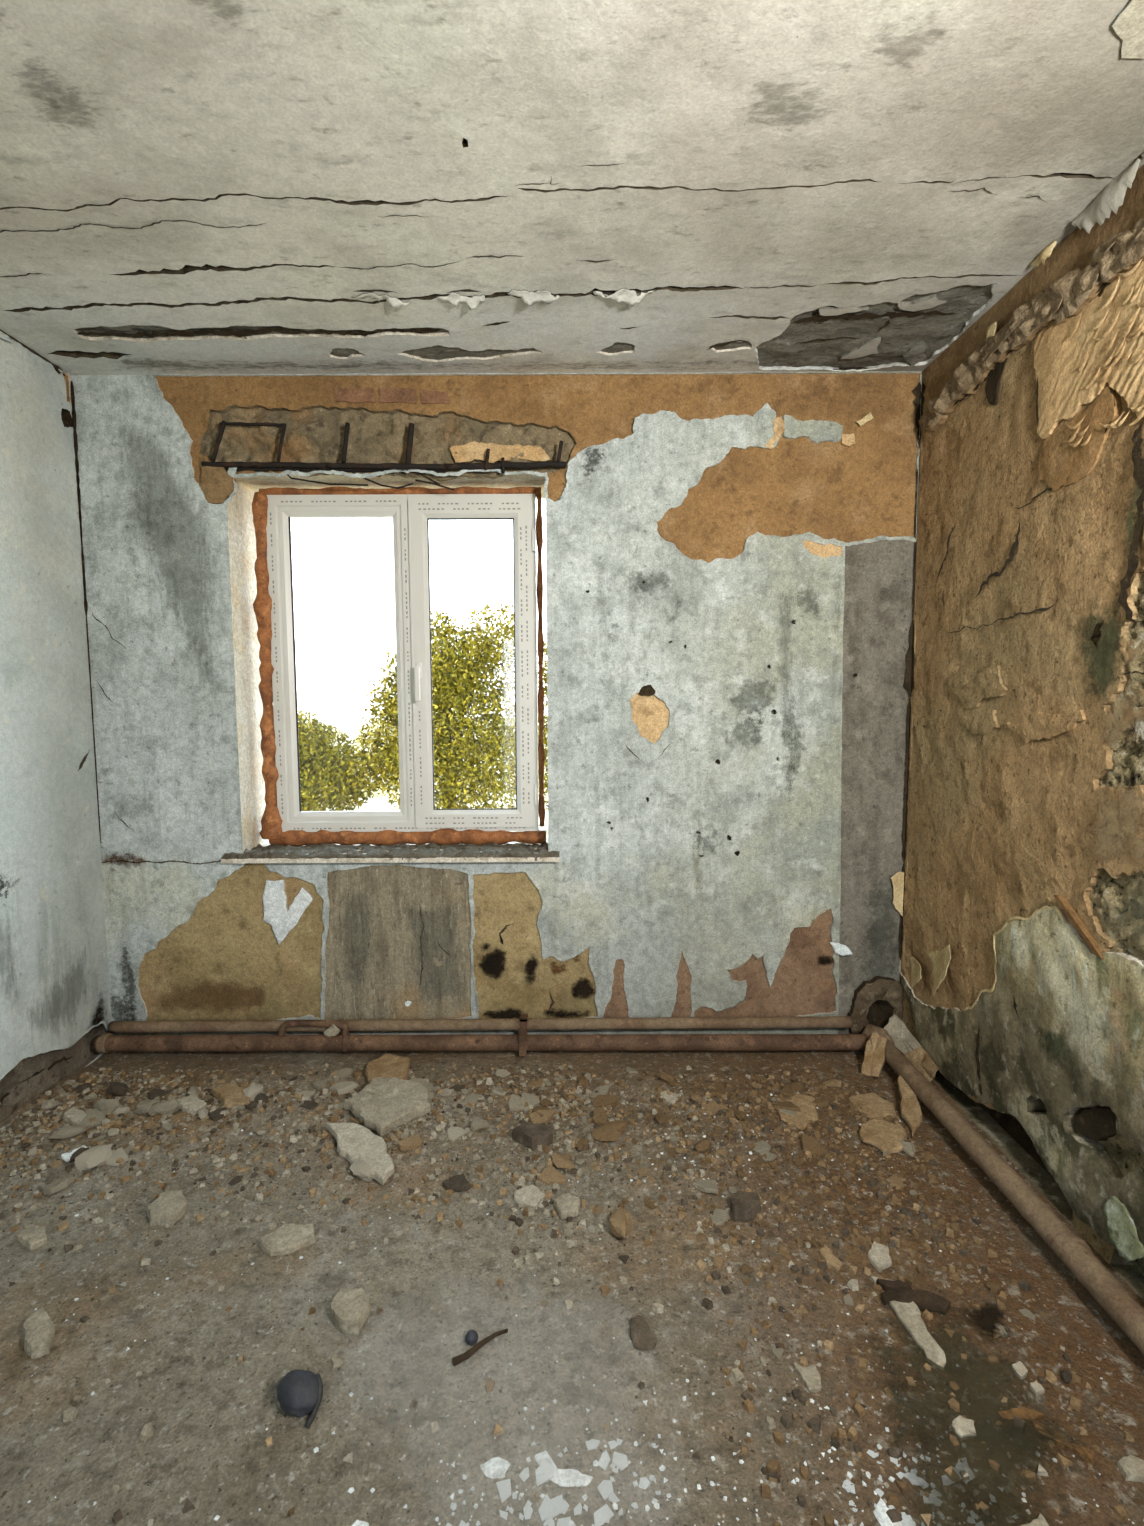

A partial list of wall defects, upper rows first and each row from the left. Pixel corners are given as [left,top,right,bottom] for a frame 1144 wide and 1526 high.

crack [0,163,1115,233]
crack [0,255,1022,865]
peeling [1021,1447,1075,1513]